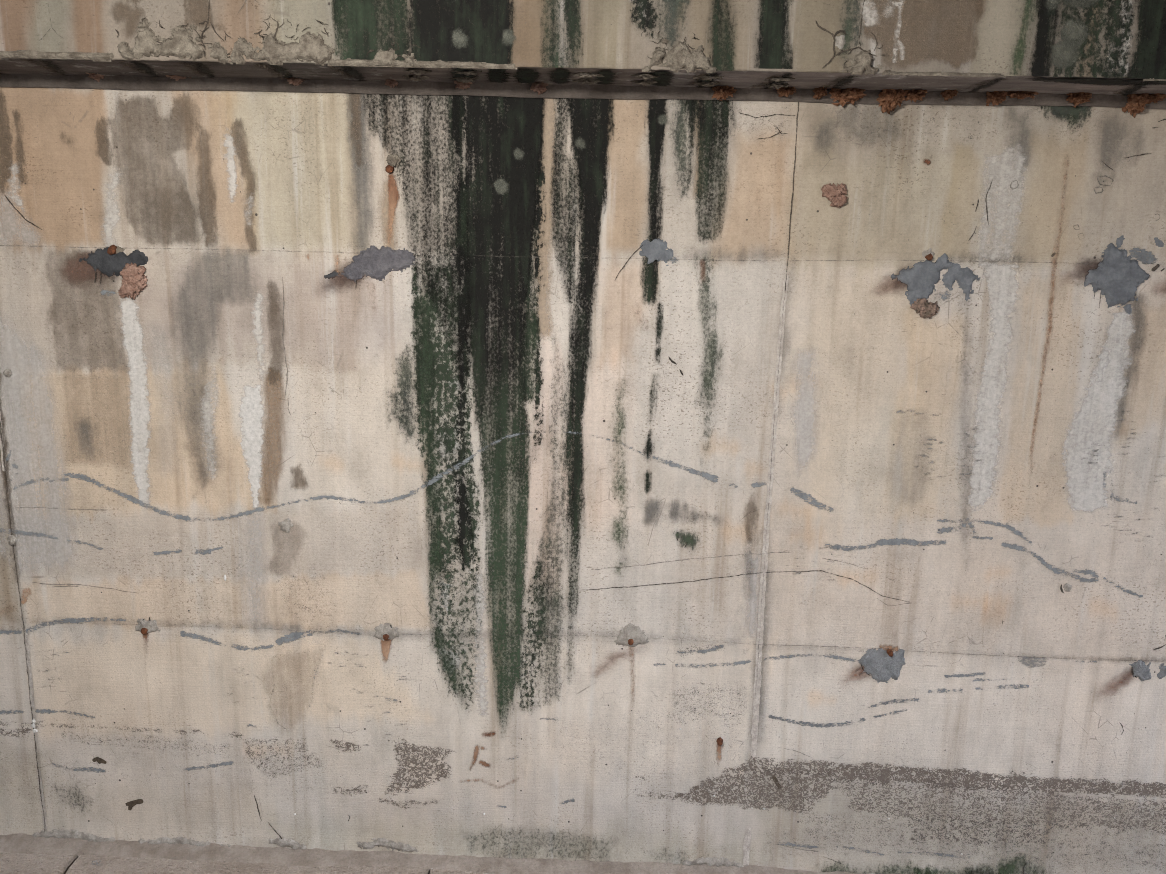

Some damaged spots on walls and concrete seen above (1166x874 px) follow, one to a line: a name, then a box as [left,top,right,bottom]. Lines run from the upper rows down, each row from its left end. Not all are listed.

damp [407,0,583,84]
damp [103,297,150,507]
damp [97,99,216,247]
damp [239,286,306,508]
rust [382,174,399,248]
damp [330,0,483,709]
damp [519,98,614,711]
damp [641,257,658,303]
damp [698,258,722,449]
damp [969,134,1026,511]
damp [1062,298,1142,511]
damp [633,768,1166,866]